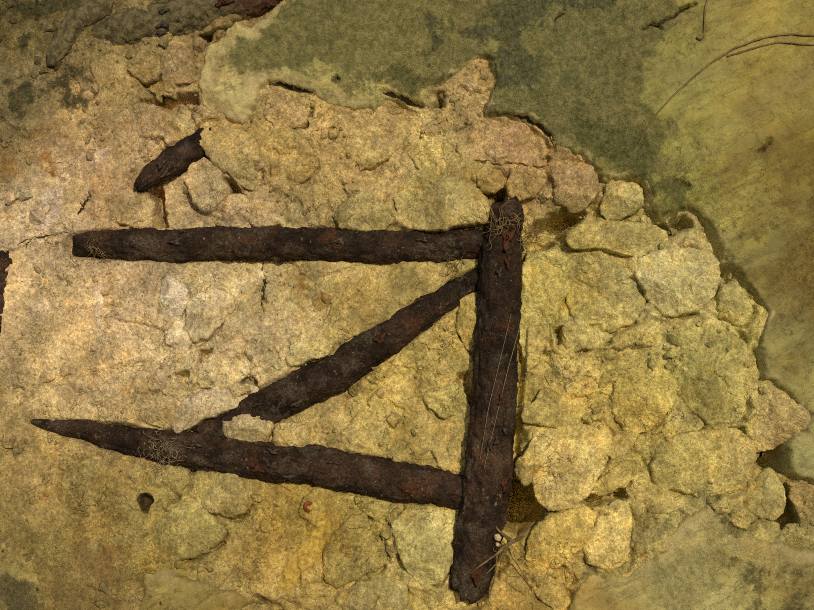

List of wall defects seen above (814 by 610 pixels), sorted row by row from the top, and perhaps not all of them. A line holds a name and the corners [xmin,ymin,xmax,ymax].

corrosion [46,0,283,71]
crack [642,6,692,30]
peeling [149,80,178,105]
corrosion [133,127,212,192]
corrosion [0,250,13,336]
corrosion [30,195,525,604]
spalling [222,291,477,475]
spalling [740,356,755,378]
spalling [702,377,811,459]
spalling [367,516,395,547]
spalling [385,502,459,524]
spalling [774,472,814,552]